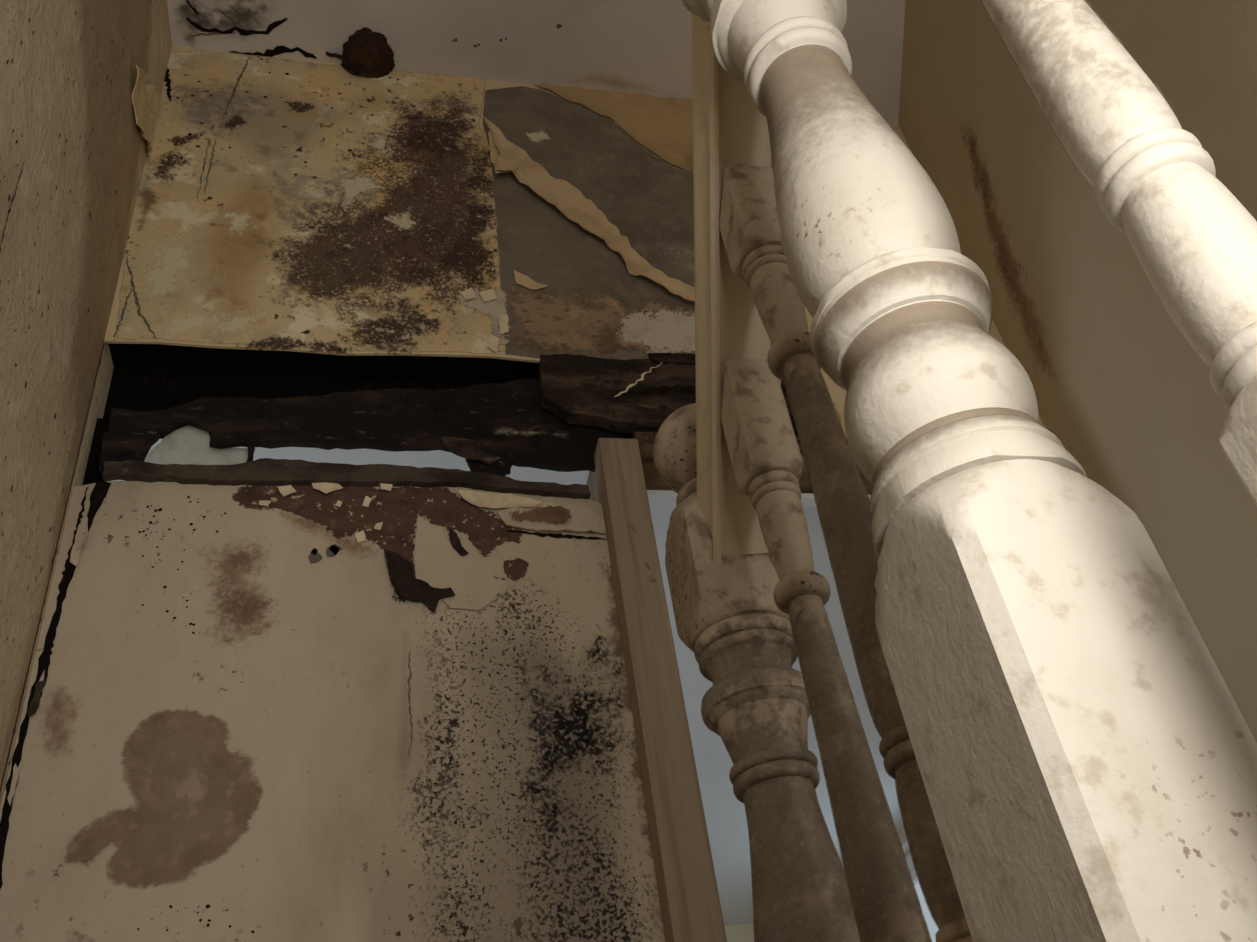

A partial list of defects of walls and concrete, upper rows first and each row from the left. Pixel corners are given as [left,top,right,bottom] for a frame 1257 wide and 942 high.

crack [186,0,317,198]
leakage [236,92,498,356]
flaking render [82,86,695,485]
crack [41,487,89,697]
peeling [232,482,543,613]
leakage [66,710,262,888]
leakage [412,590,653,942]